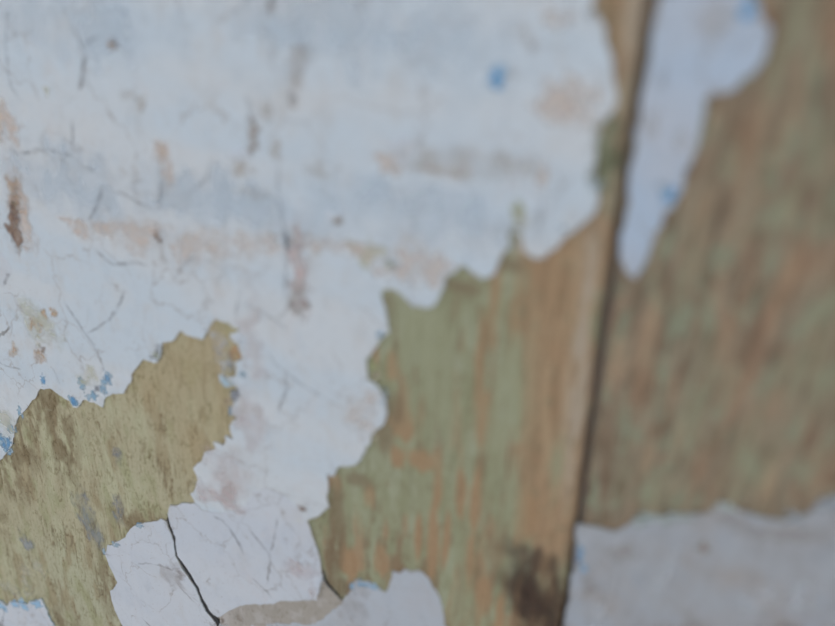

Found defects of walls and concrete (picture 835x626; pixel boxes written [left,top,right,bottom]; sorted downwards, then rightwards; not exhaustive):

crack [169,527,220,626]
peeling [0,0,648,626]
peeling [582,0,835,531]